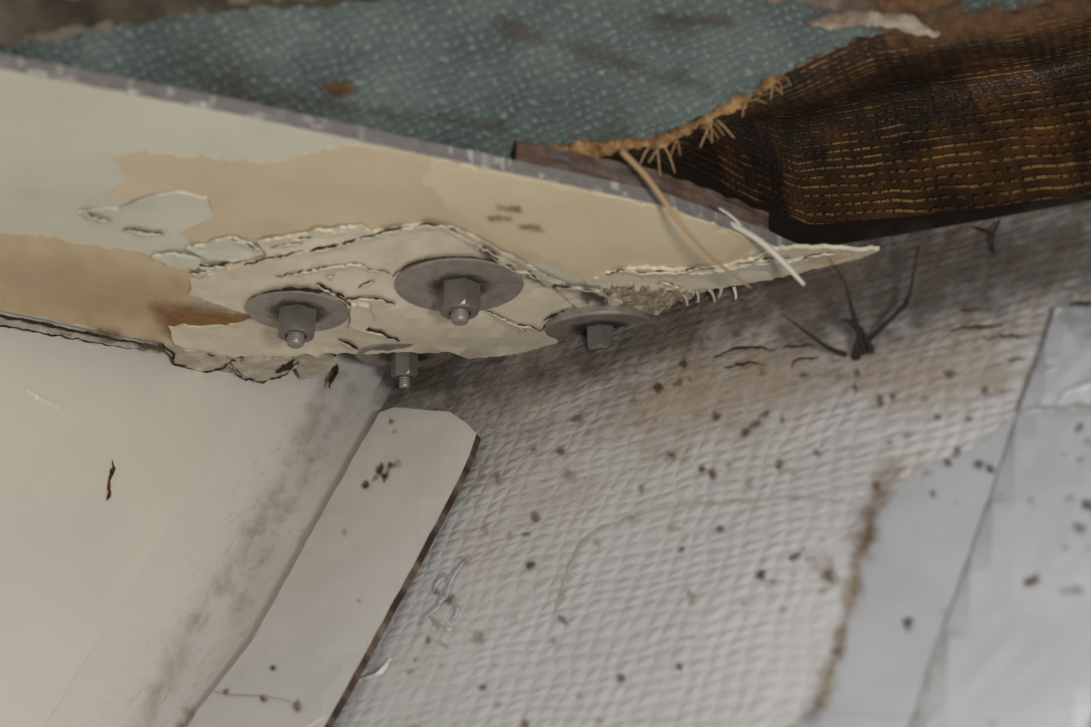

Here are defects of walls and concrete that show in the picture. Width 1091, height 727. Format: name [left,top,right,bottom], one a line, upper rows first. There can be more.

peeling [765,0,941,38]
peeling [0,144,880,381]
crack [0,314,299,384]
corrosion [158,307,252,333]
crack [190,222,537,388]
crack [484,285,570,333]